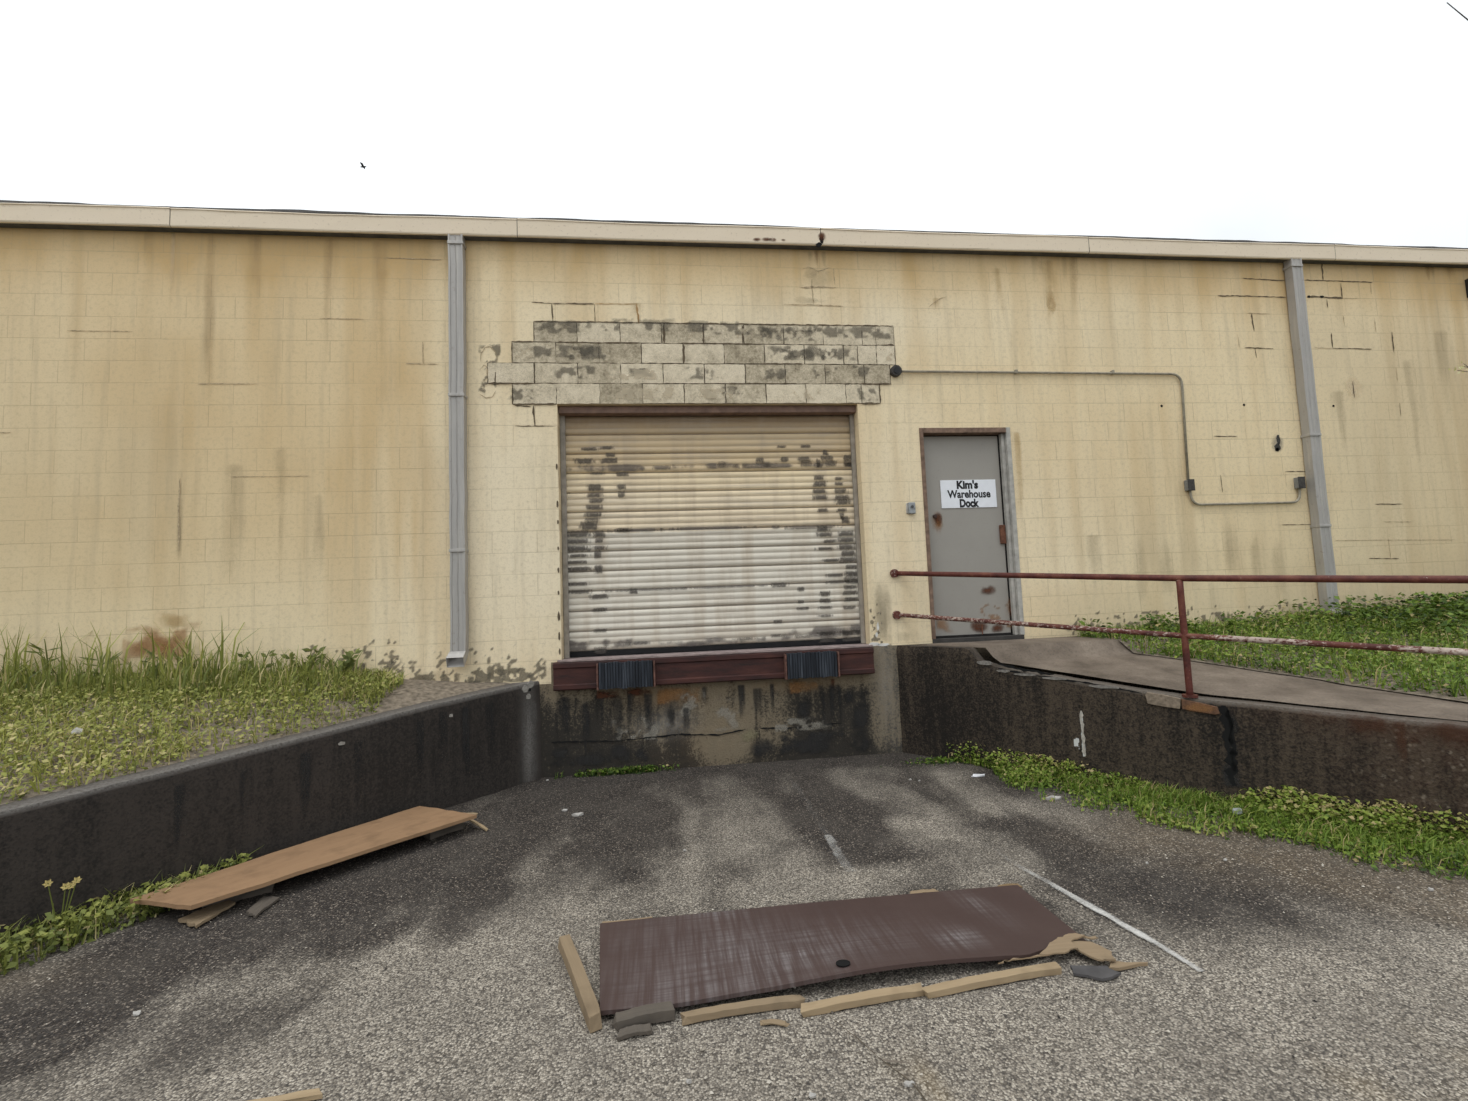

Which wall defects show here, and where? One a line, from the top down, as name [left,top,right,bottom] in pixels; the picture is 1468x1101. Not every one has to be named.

peeling [480,320,896,405]
crack [1218,264,1401,414]
damp [553,687,706,765]
damp [719,684,869,755]
crack [829,1016,927,1101]